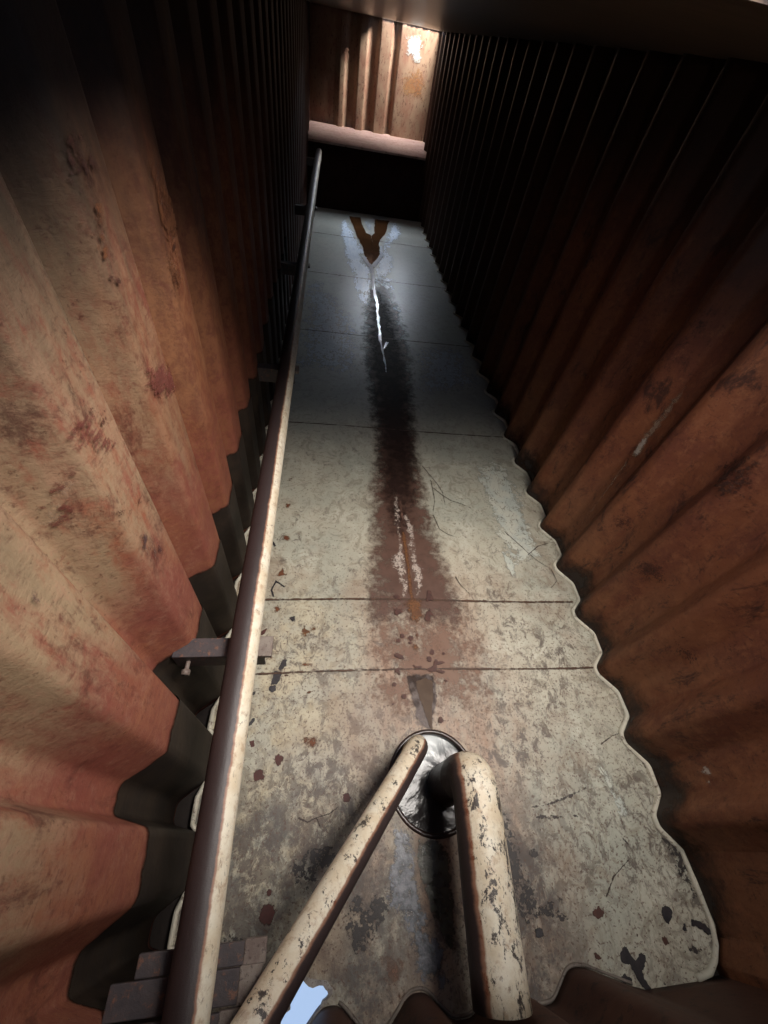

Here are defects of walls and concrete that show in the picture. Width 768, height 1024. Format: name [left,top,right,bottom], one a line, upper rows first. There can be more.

water stain [297,220,492,730]
crack [422,466,470,536]
crack [505,532,557,588]
corrosion [392,501,448,705]
peeling [662,905,673,924]
peeling [682,919,711,935]
peeling [613,934,651,990]